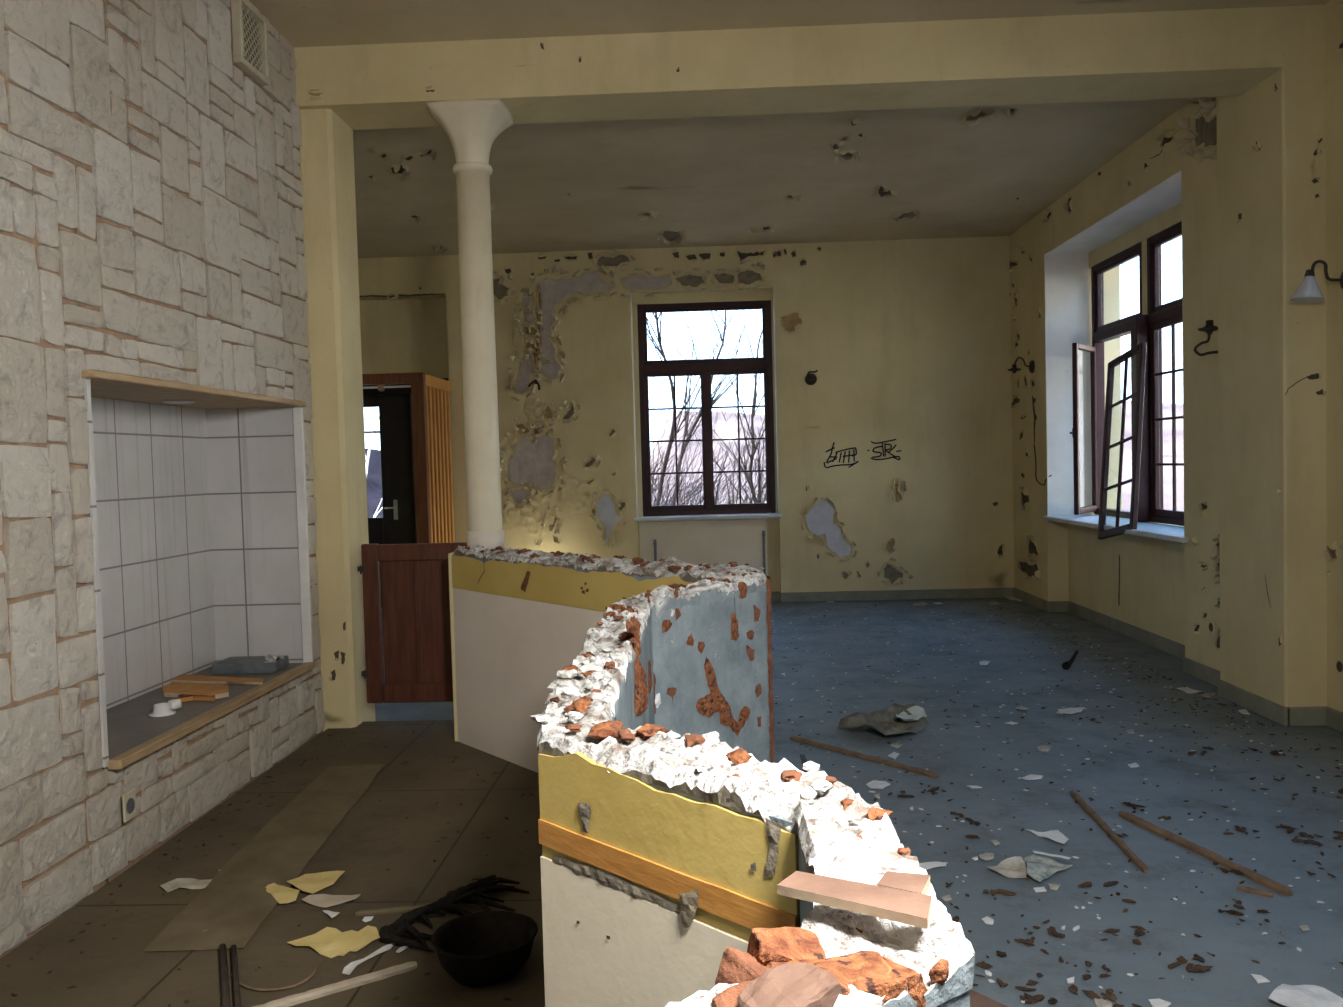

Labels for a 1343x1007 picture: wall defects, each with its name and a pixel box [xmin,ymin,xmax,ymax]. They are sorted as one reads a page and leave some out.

peeling [1162,97,1217,163]
peeling [675,248,775,293]
peeling [780,311,804,334]
peeling [493,248,636,549]
peeling [801,486,914,587]
flaking render [662,587,681,633]
flaking render [626,616,677,716]
flaking render [686,575,775,763]
flaking render [577,802,591,833]
flaking render [648,782,783,877]
spalling [712,926,949,1007]